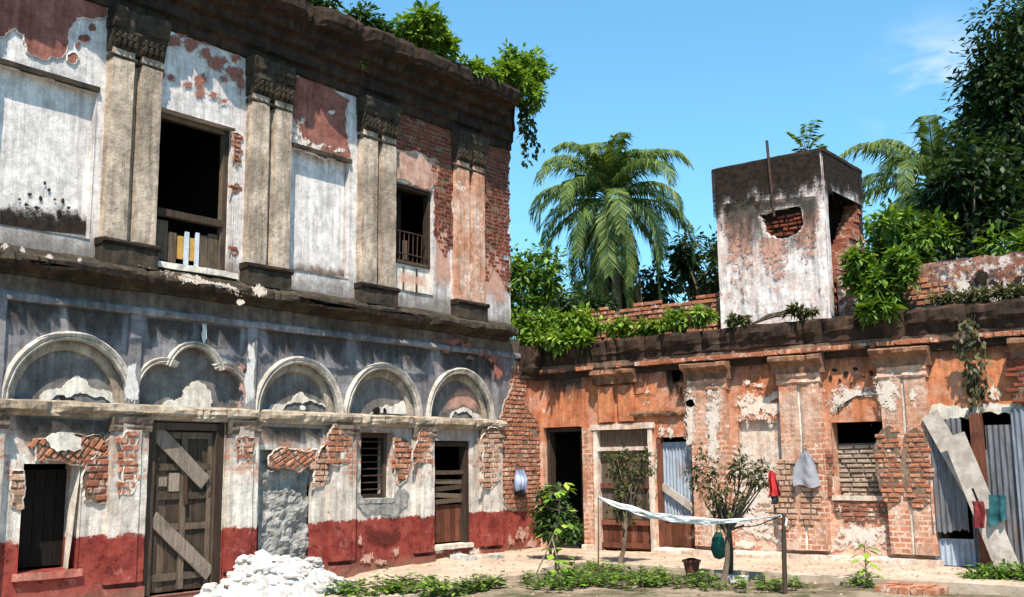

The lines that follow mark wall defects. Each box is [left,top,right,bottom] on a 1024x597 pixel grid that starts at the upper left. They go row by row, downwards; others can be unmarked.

peeling [0,0,108,65]
peeling [292,76,352,161]
damp [0,181,86,235]
flaking render [396,114,453,257]
flaking render [484,146,511,292]
peeling [722,206,823,295]
damp [711,152,863,243]
peeling [39,376,113,403]
flaking render [27,430,140,506]
flaking render [267,424,433,517]
flaking render [442,338,541,512]
flaking render [648,367,934,554]